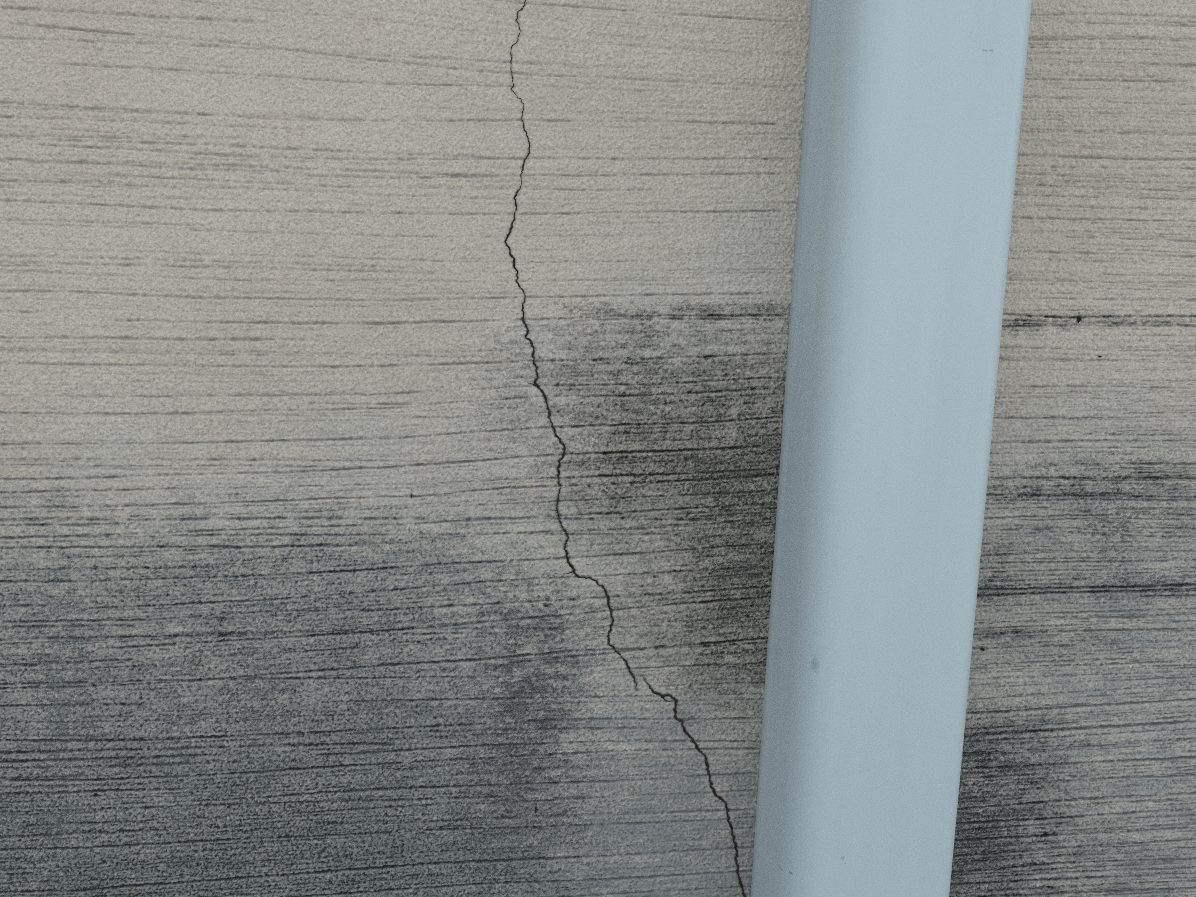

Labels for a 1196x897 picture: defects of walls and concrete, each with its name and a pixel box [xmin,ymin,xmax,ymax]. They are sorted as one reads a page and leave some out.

water stain [1008,315,1129,327]
crack [504,0,746,897]
water stain [552,331,785,693]
water stain [977,547,1196,602]
water stain [994,463,1193,501]
water stain [0,517,600,897]
water stain [949,710,1102,897]